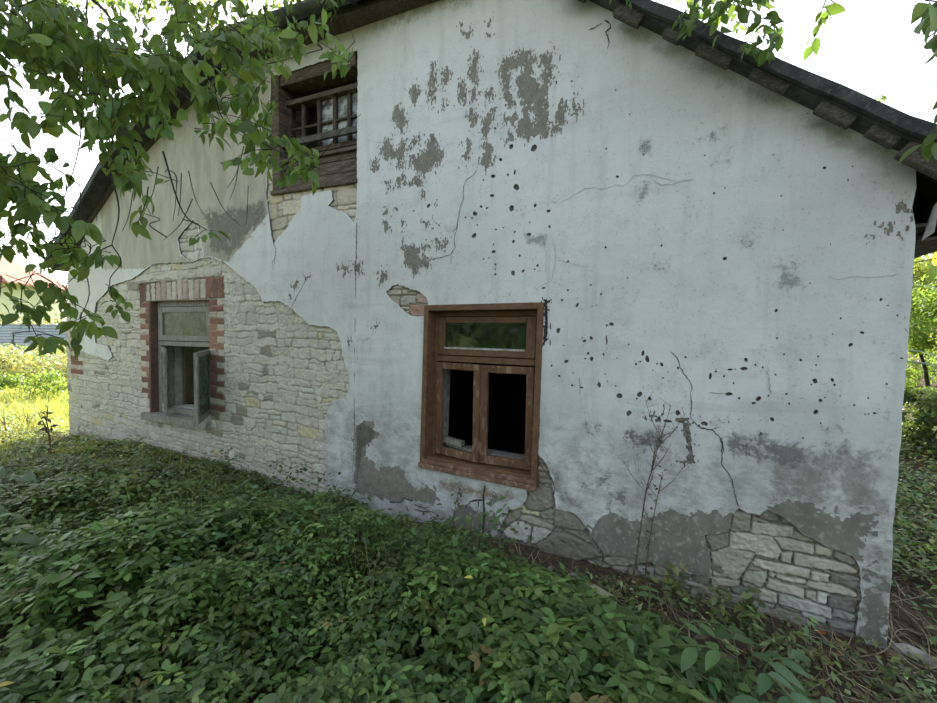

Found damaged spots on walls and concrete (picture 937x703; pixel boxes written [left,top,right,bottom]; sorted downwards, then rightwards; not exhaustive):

peeling [456,16,495,39]
crack [431,170,477,260]
peeling [336,41,586,323]
crack [564,174,692,201]
spalling [65,60,357,495]
damp [626,431,663,453]
crack [670,351,739,507]
damp [728,433,888,512]
spalling [351,419,891,647]